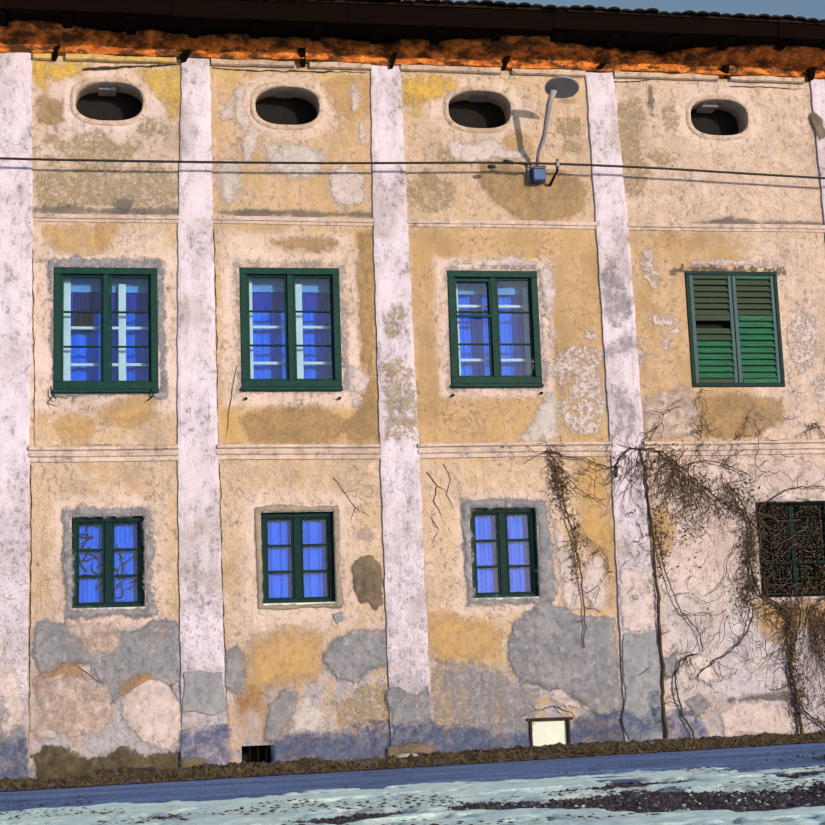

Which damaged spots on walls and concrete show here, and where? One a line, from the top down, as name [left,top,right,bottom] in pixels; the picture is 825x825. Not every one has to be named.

peeling [215,83,366,210]
flaking render [810,112,825,139]
peeling [639,247,786,291]
peeling [483,255,558,341]
peeling [648,313,684,352]
peeling [786,308,820,374]
peeling [521,330,607,442]
crack [426,464,453,543]
flaking render [352,555,383,610]
flaking render [68,621,119,655]
peeling [289,695,326,736]
peeling [548,689,589,710]